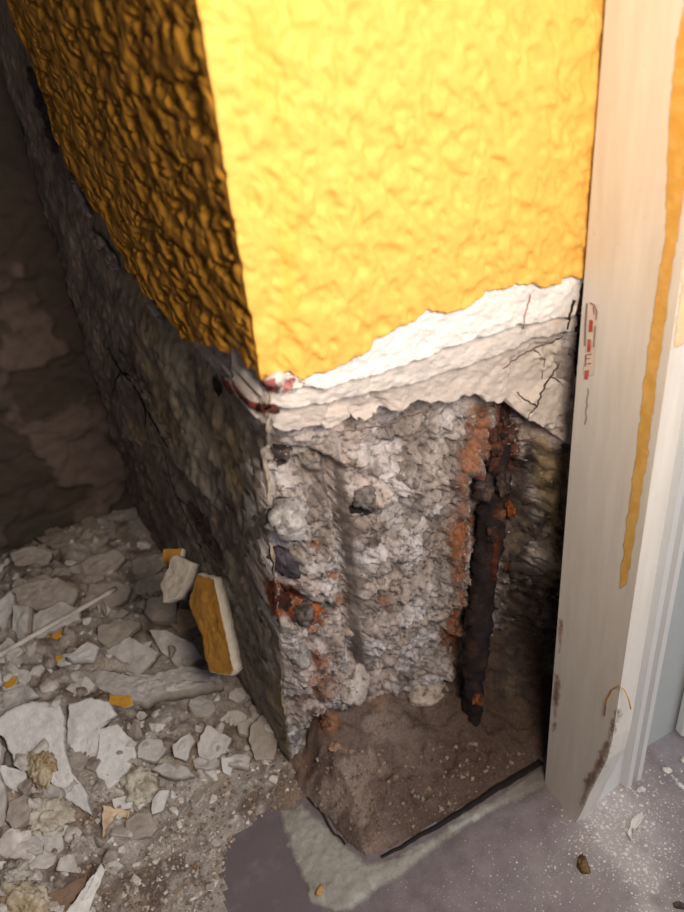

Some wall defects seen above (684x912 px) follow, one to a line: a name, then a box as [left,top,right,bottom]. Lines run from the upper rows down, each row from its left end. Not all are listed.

crack [107,347,206,562]
corrosion [263,581,325,634]
spalling [192,276,584,761]
corrosion [441,403,520,658]
crack [503,283,589,425]